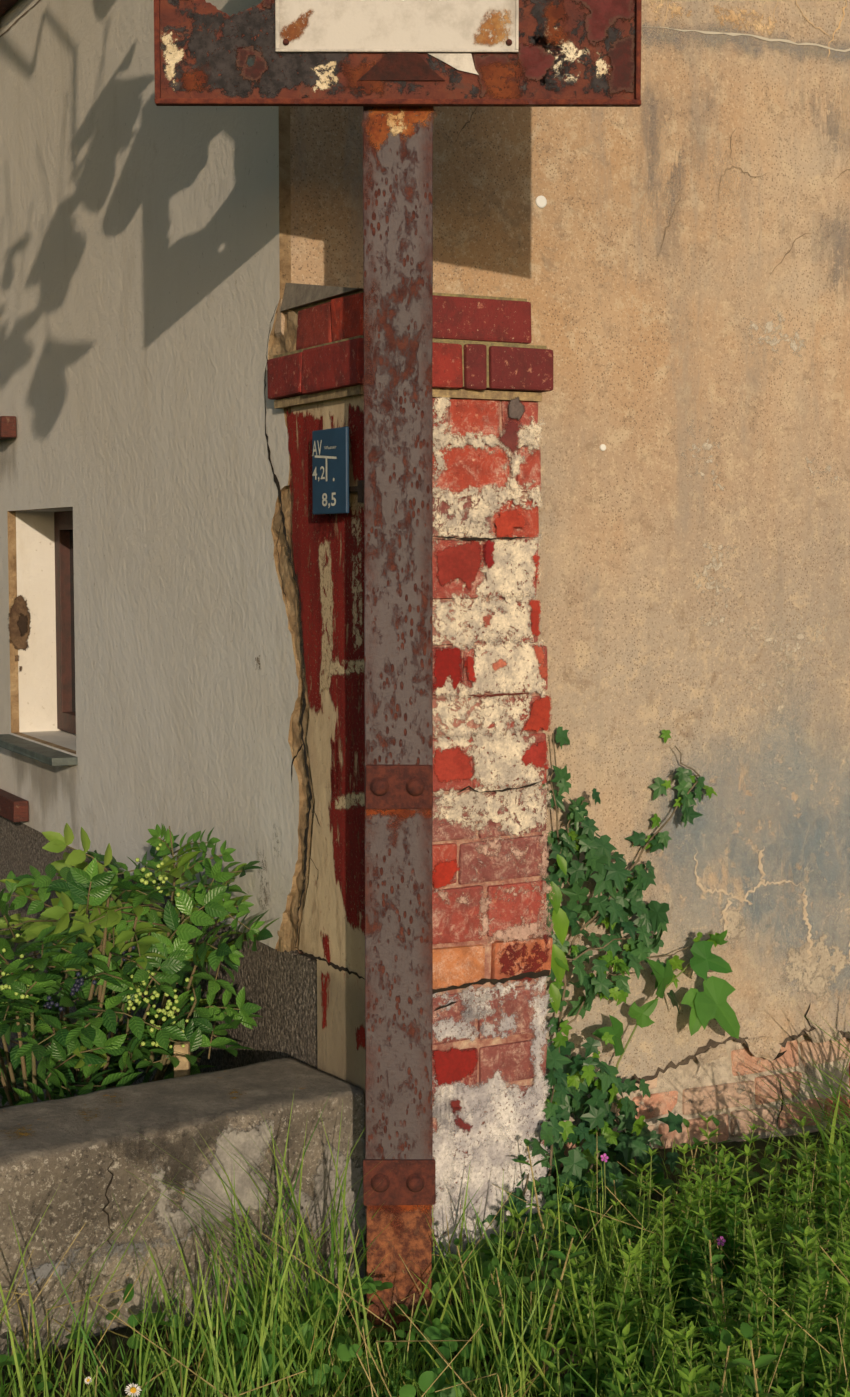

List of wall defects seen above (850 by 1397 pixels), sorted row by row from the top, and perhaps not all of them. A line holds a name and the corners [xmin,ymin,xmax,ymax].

flaking render [269,310,298,359]
crack [264,306,365,980]
peeling [272,403,365,952]
peeling [432,397,554,982]
peeling [719,908,747,951]
peeling [320,932,330,1029]
peeling [356,1024,365,1051]
peeling [433,1047,478,1132]
flaking render [609,934,850,1149]